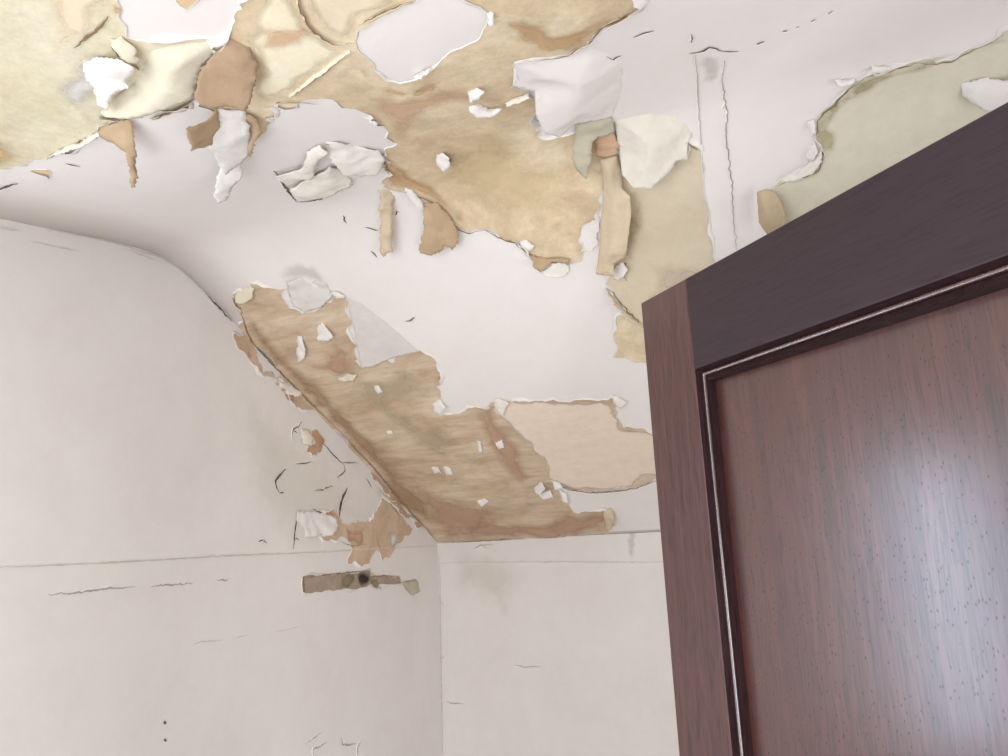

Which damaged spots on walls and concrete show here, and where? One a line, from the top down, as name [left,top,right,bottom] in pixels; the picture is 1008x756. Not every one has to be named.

peeling [0,0,719,363]
crack [689,35,737,250]
peeling [757,24,1008,234]
crack [0,420,663,748]
peeling [232,278,656,595]